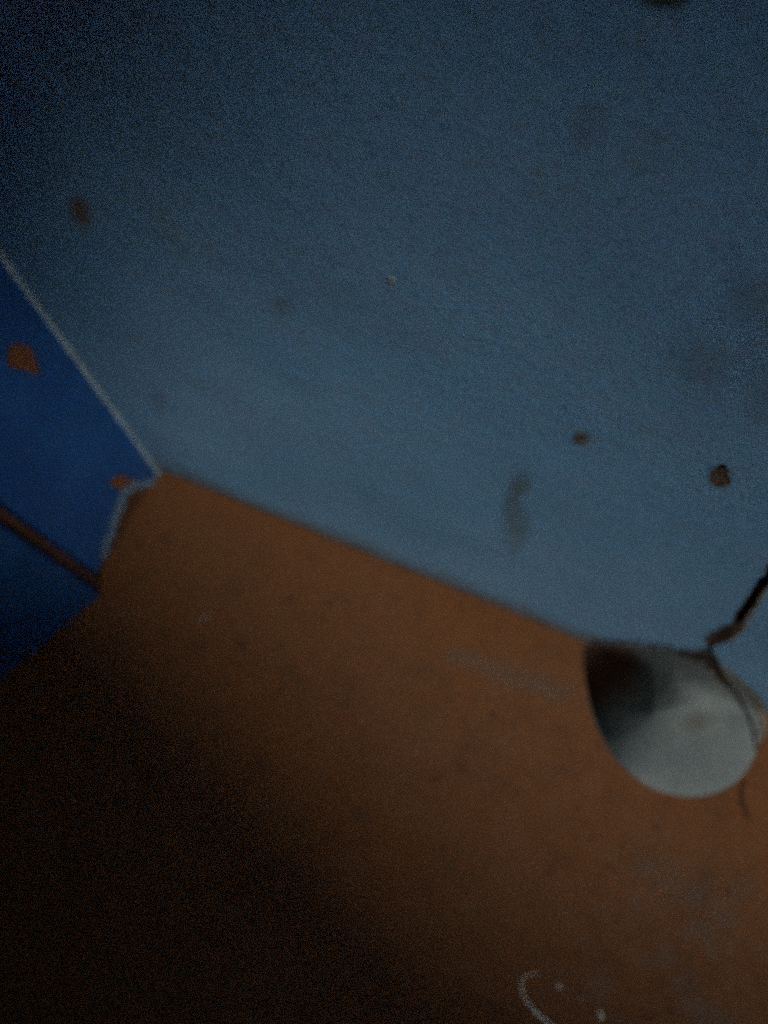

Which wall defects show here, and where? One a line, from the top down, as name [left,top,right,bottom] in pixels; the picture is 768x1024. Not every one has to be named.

spalling [582,639,768,797]
crack [705,563,768,753]